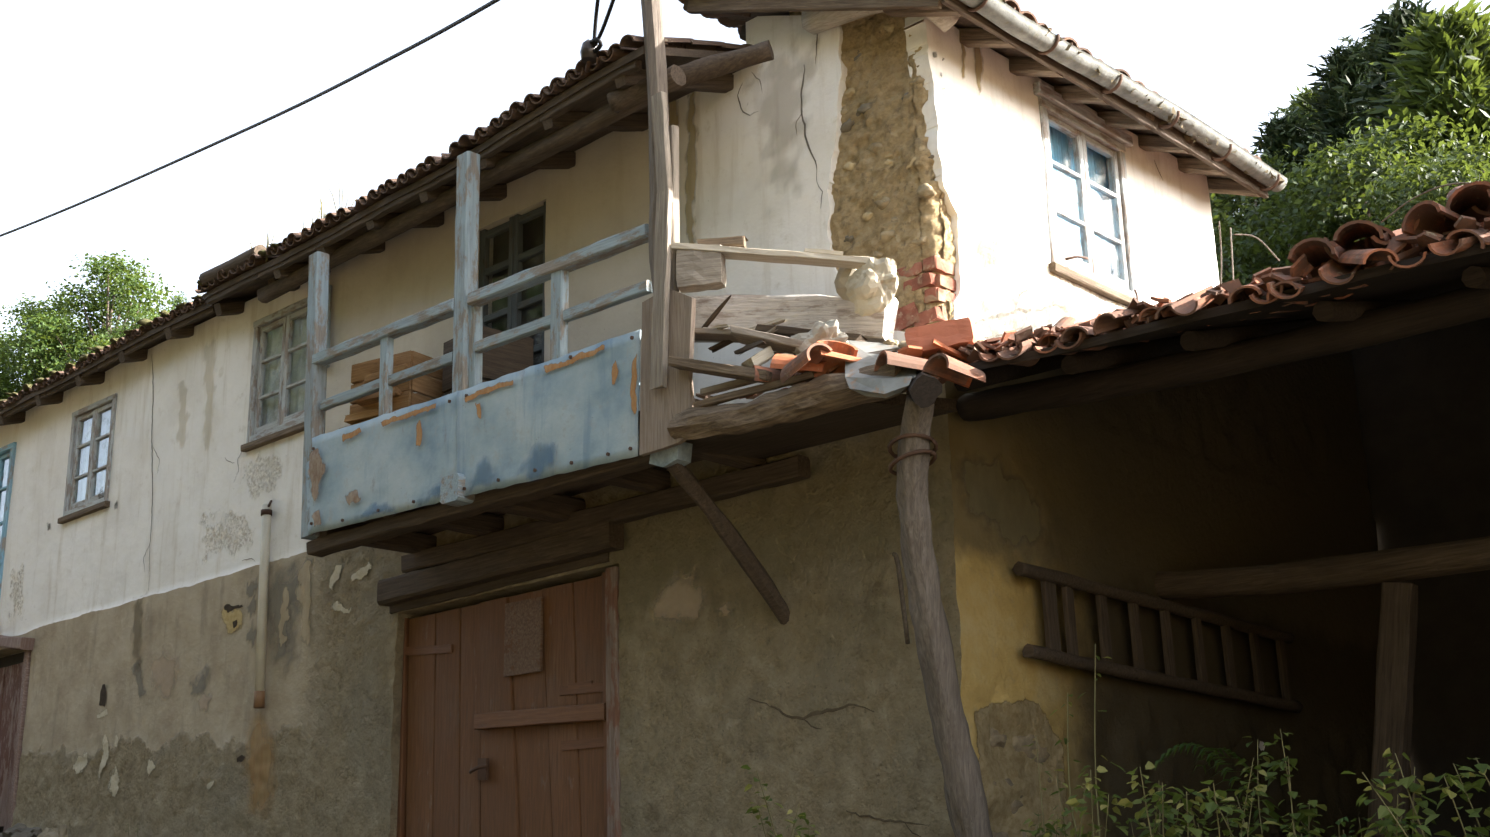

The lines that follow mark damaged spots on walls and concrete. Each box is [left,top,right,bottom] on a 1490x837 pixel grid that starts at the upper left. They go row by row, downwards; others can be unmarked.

crack [737,74,762,116]
crack [795,34,823,209]
flaking render [830,12,956,332]
damp [973,232,1075,342]
flaking render [73,684,120,797]
flaking render [974,698,1074,837]